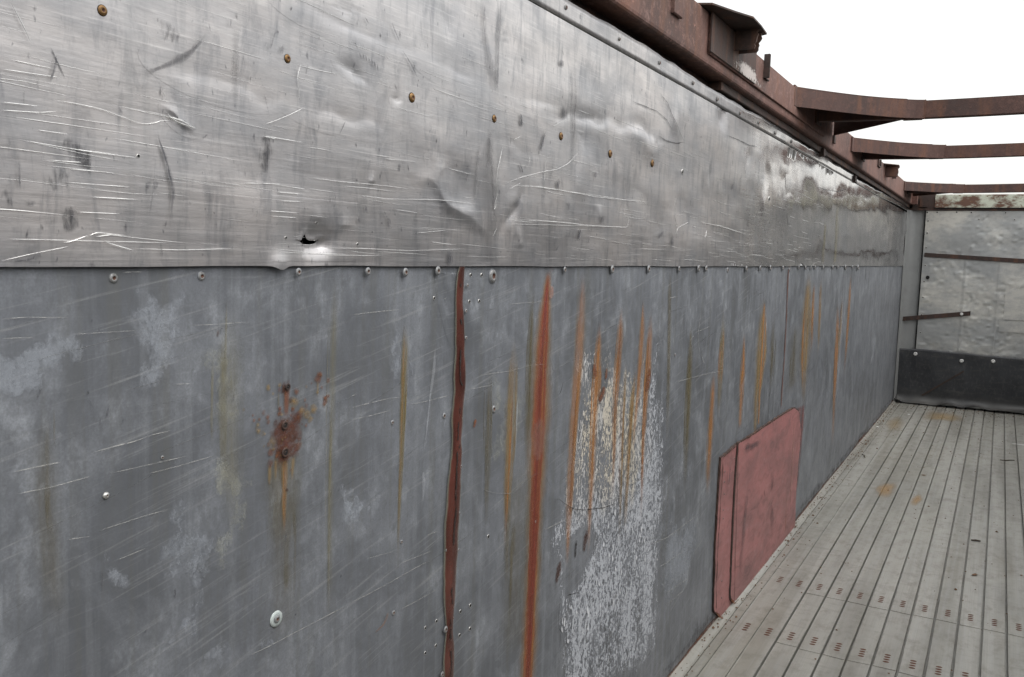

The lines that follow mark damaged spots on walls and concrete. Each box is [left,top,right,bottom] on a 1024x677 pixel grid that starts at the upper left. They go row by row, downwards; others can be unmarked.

rust [253,384,327,516]
rust [525,281,553,677]
rust [590,331,651,472]